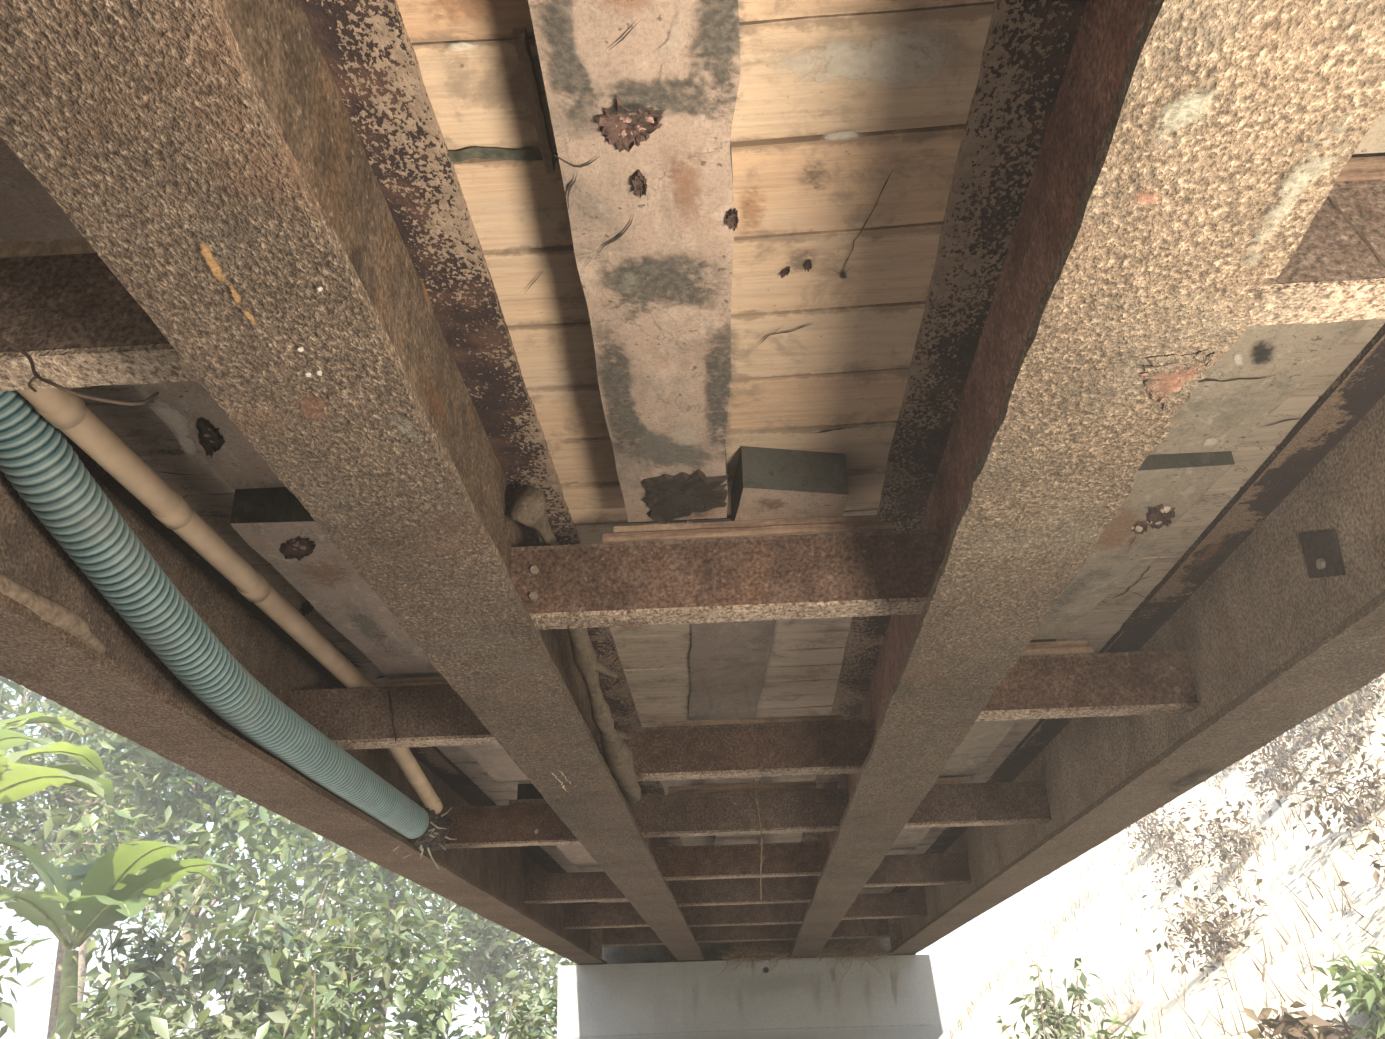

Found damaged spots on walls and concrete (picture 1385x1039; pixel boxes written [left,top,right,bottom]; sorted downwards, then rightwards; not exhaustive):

spalling [594,97,663,153]
leakage [605,257,712,313]
spalling [195,417,225,459]
spalling [1131,504,1175,535]
spalling [278,536,316,561]